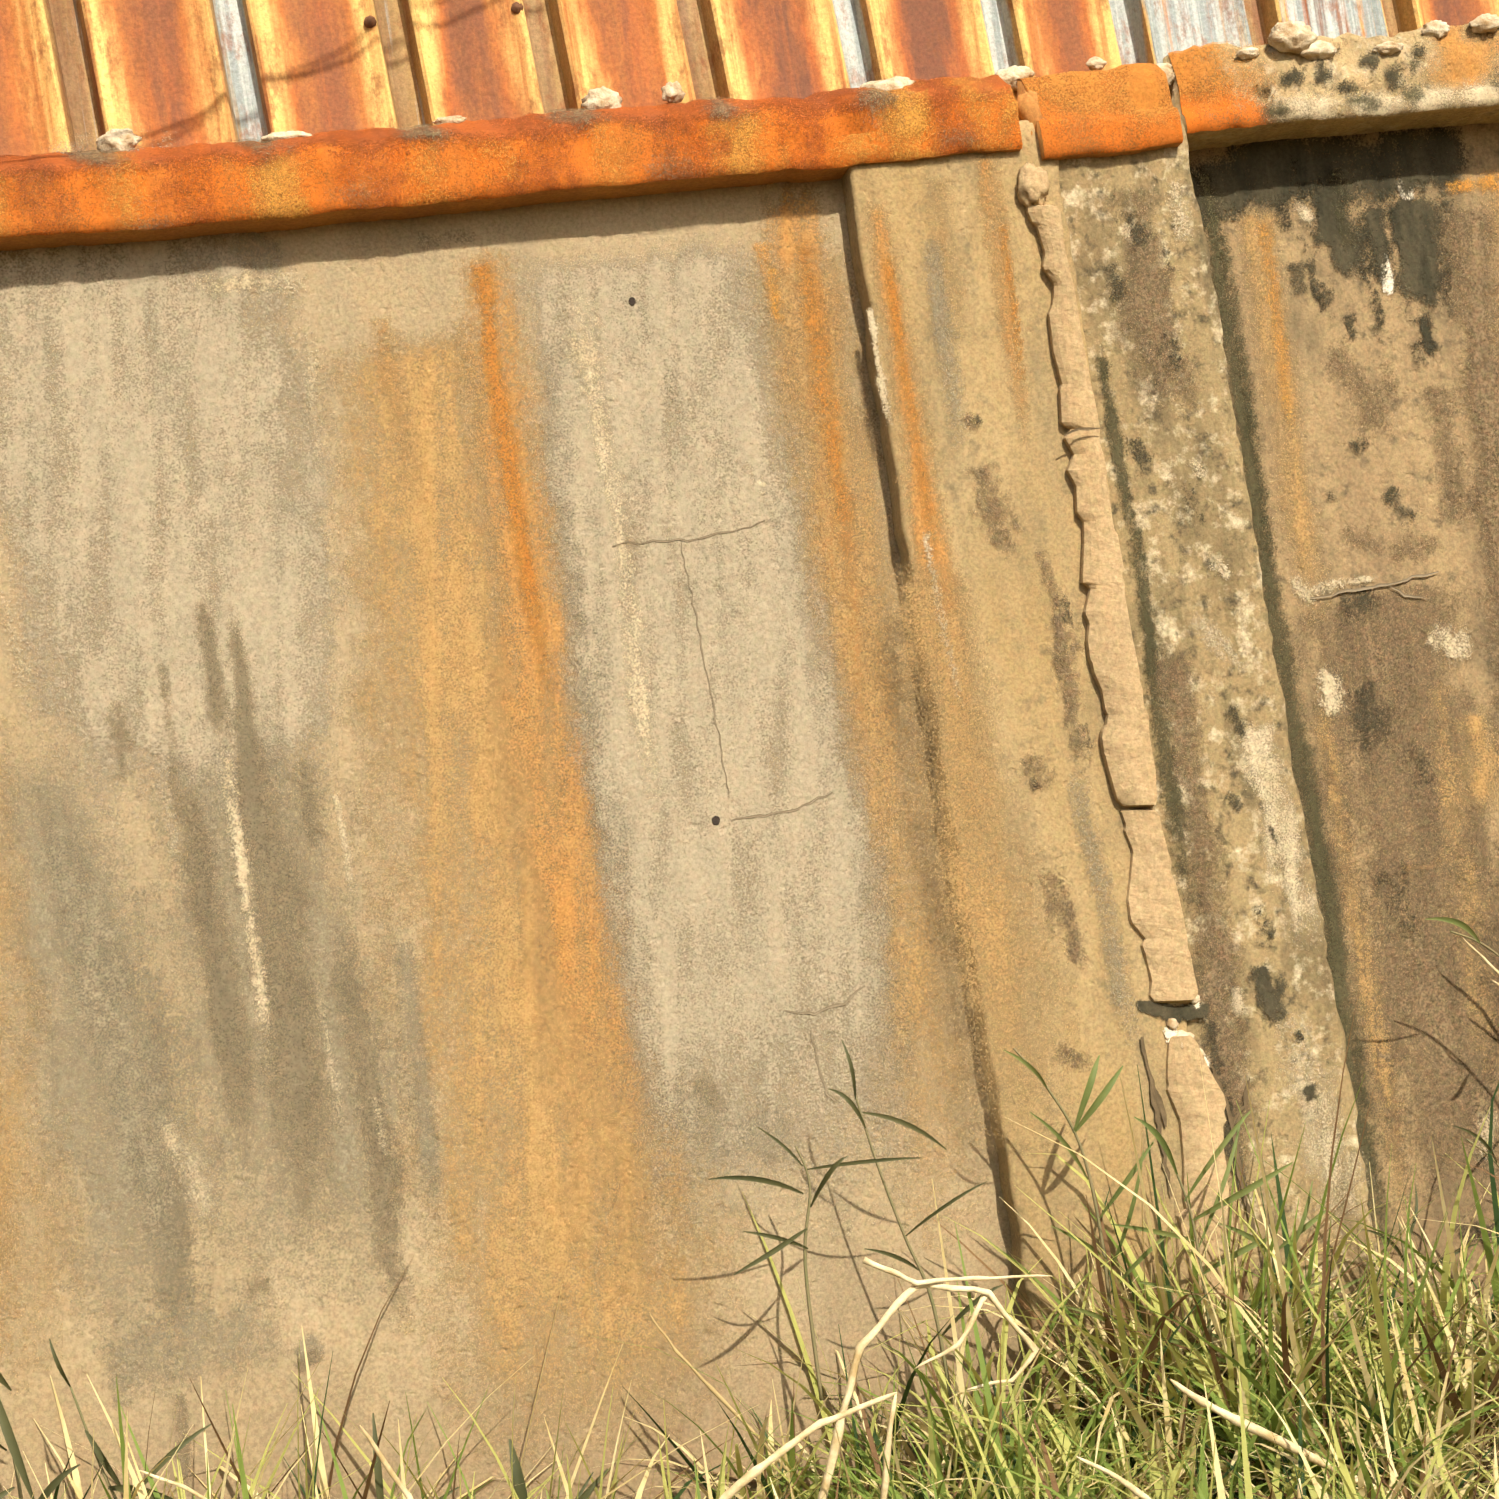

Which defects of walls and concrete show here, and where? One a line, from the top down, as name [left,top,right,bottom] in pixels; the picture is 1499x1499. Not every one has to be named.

rust [1423,23,1499,90]
damp [1101,188,1199,417]
damp [1,604,440,1484]
rust [328,251,742,1461]
rust [0,42,1272,1227]
crack [612,520,833,822]
crack [784,986,864,1101]
damp [1036,550,1133,1033]
spalling [1136,1000,1209,1043]
damp [1096,357,1258,1198]
damp [1189,126,1499,1246]
crack [1310,571,1439,600]